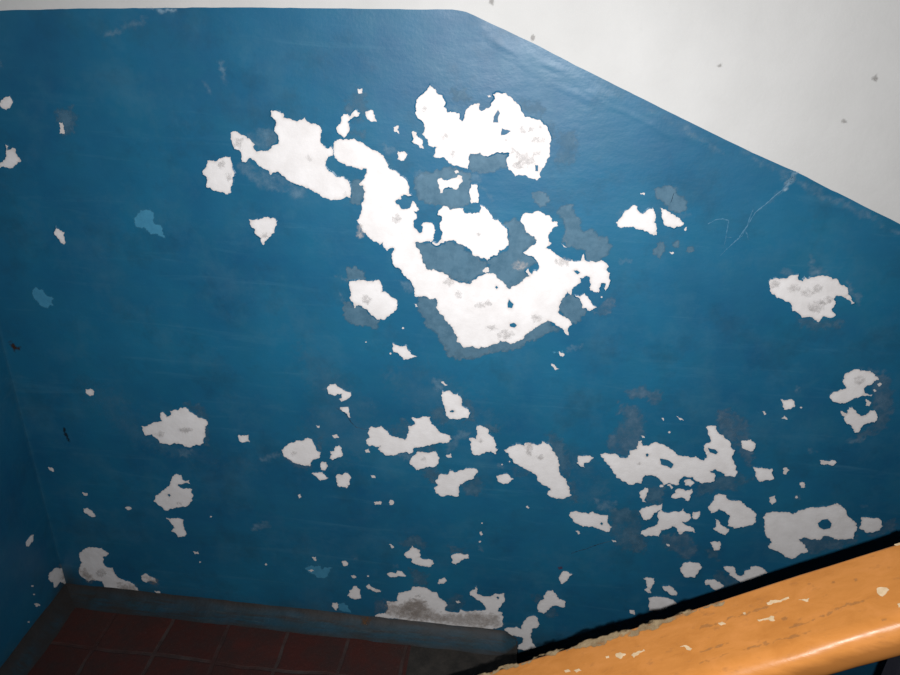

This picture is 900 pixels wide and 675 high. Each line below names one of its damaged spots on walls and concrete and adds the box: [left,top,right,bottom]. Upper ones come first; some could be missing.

peeling [201,83,612,360]
peeling [616,186,693,257]
peeling [768,271,856,326]
peeling [141,406,208,448]
peeling [281,434,351,488]
peeling [365,381,571,499]
peeling [780,398,802,420]
peeling [829,368,892,437]
peeling [153,473,194,538]
peeling [568,410,895,590]
peeling [78,547,160,593]
peeling [342,561,574,650]